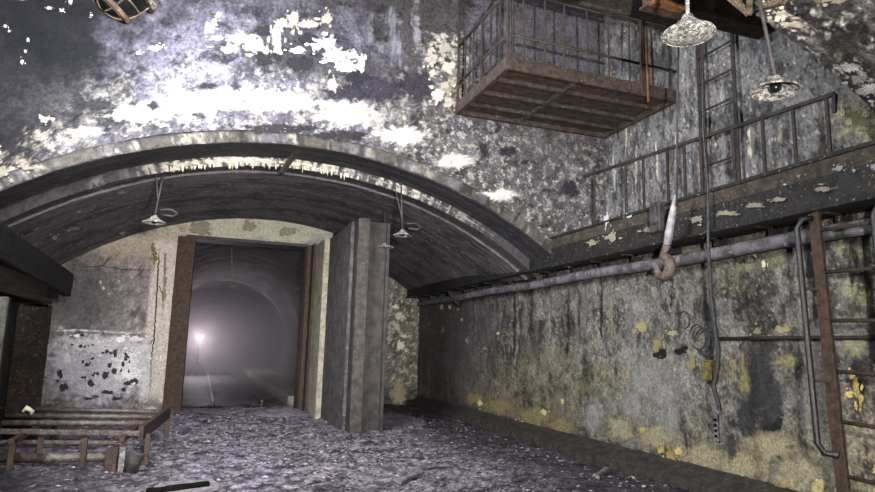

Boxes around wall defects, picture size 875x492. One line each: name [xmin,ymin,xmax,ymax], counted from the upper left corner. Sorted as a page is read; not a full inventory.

peeling [204,7,372,94]
spalling [0,164,38,183]
water stain [498,293,528,354]
water stain [599,285,614,339]
water stain [806,246,817,322]
peeling [45,326,156,408]
water stain [465,392,577,434]